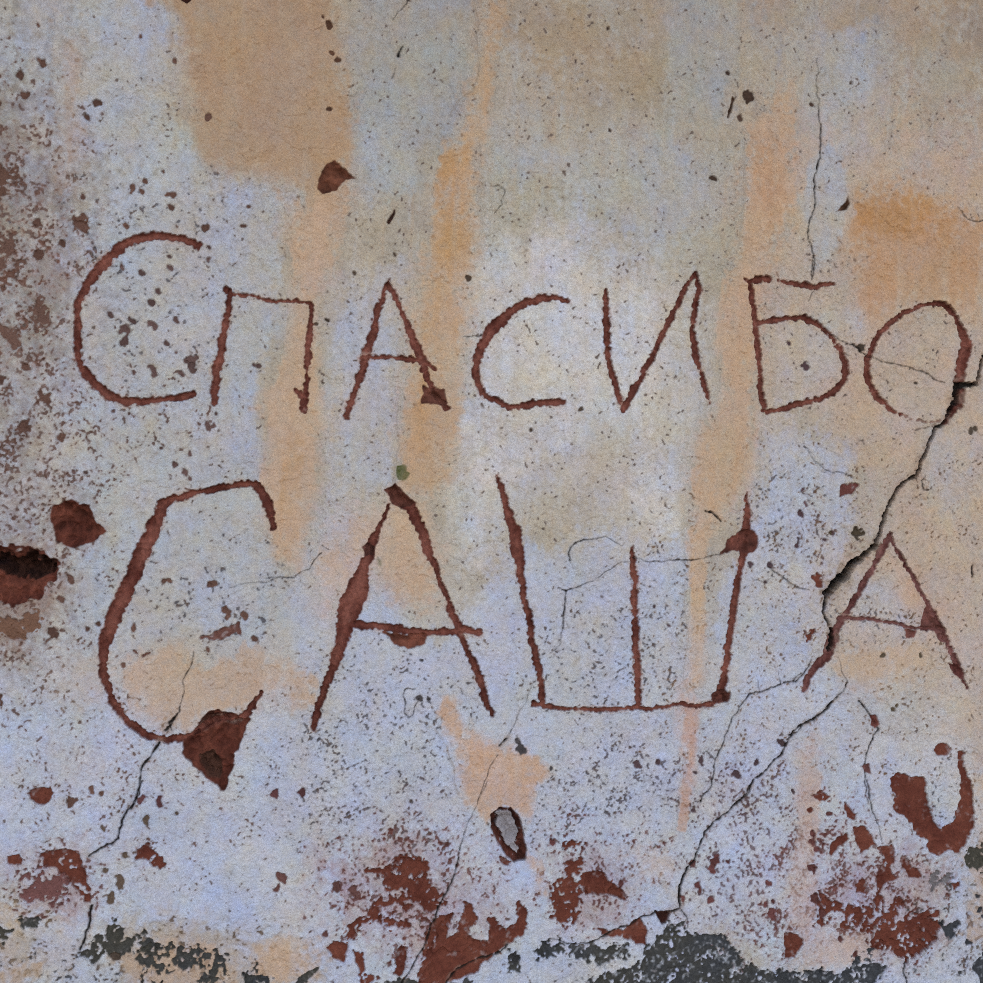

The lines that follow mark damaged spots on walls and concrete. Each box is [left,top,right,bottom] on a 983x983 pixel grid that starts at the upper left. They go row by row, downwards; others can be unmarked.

crack [392,0,409,21]
crack [392,46,404,79]
crack [806,58,822,302]
crack [958,207,983,223]
spalling [50,499,107,549]
spalling [0,543,75,645]
crack [548,329,983,945]
peeling [890,743,983,875]
peeling [6,848,91,910]
peeling [77,918,270,983]
peeling [321,850,528,983]
peeling [533,790,973,983]